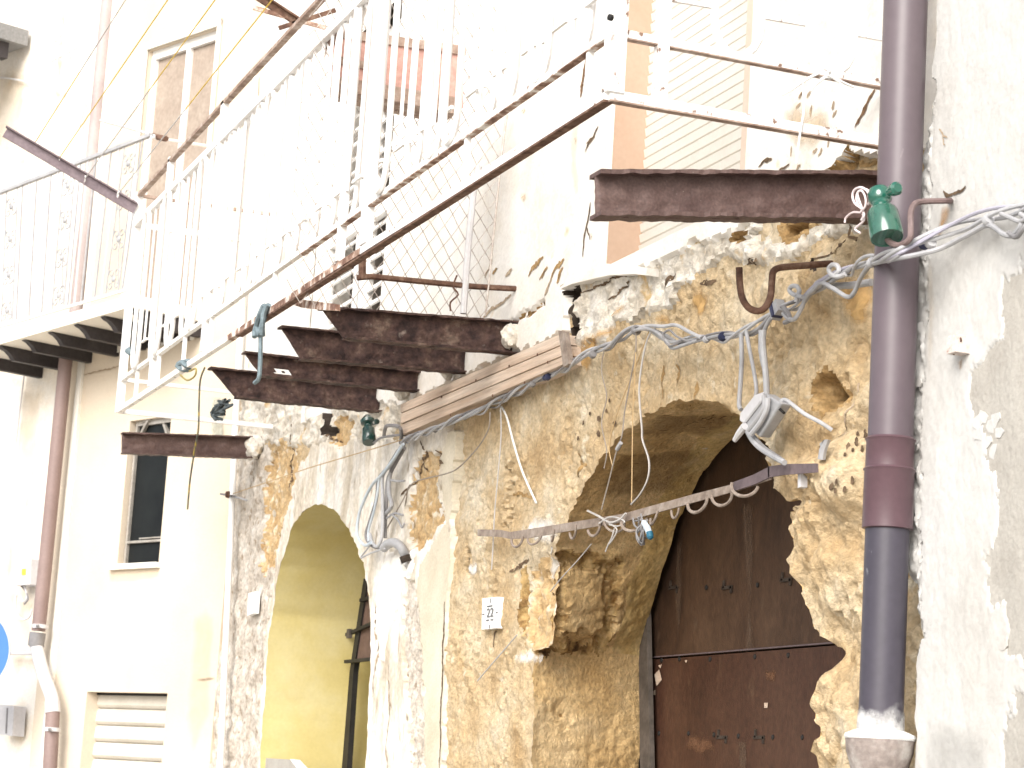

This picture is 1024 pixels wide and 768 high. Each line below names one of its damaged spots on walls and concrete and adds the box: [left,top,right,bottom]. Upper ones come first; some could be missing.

spalling [920,82,937,235]
spalling [513,256,564,321]
spalling [729,230,748,244]
spalling [777,222,819,246]
spalling [258,438,299,578]
spalling [809,365,853,419]
spalling [843,429,868,457]
spalling [909,249,931,638]
peeling [969,269,1024,664]
peeling [375,451,445,768]
spalling [509,549,626,658]
peeling [1003,691,1024,768]